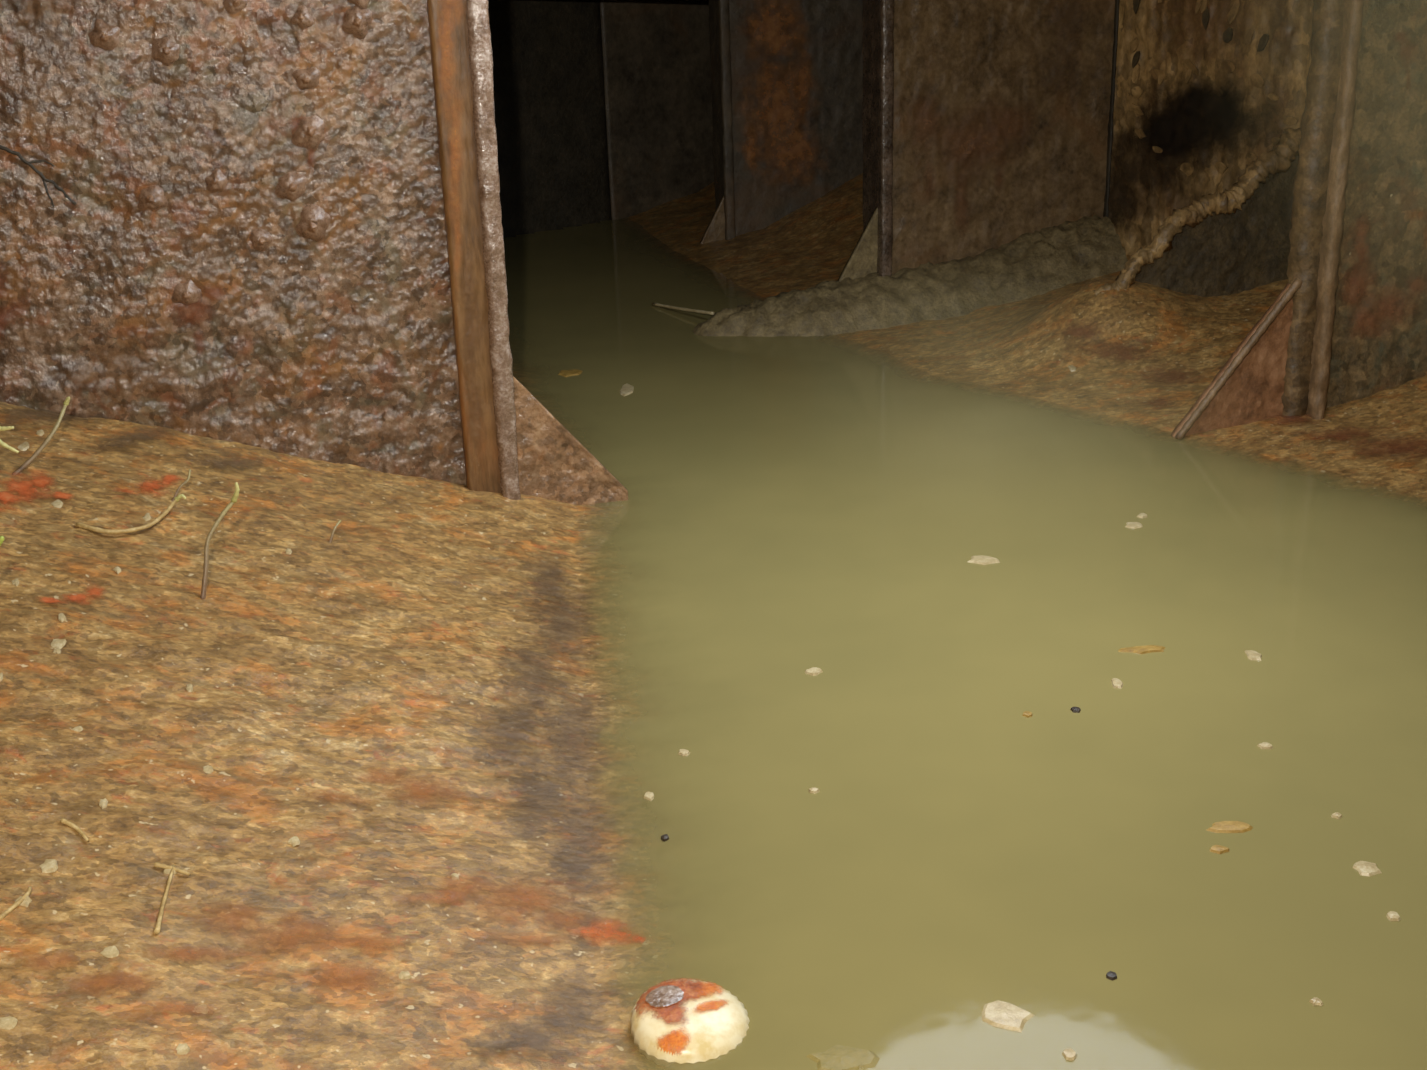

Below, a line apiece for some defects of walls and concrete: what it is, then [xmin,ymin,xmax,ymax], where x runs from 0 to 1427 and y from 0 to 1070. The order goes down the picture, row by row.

rust [223,0,247,14]
rust [290,5,314,30]
rust [341,0,372,39]
rust [88,18,120,51]
rust [151,37,180,66]
rust [292,67,321,90]
rust [205,168,228,193]
rust [275,115,331,242]
rust [136,185,168,223]